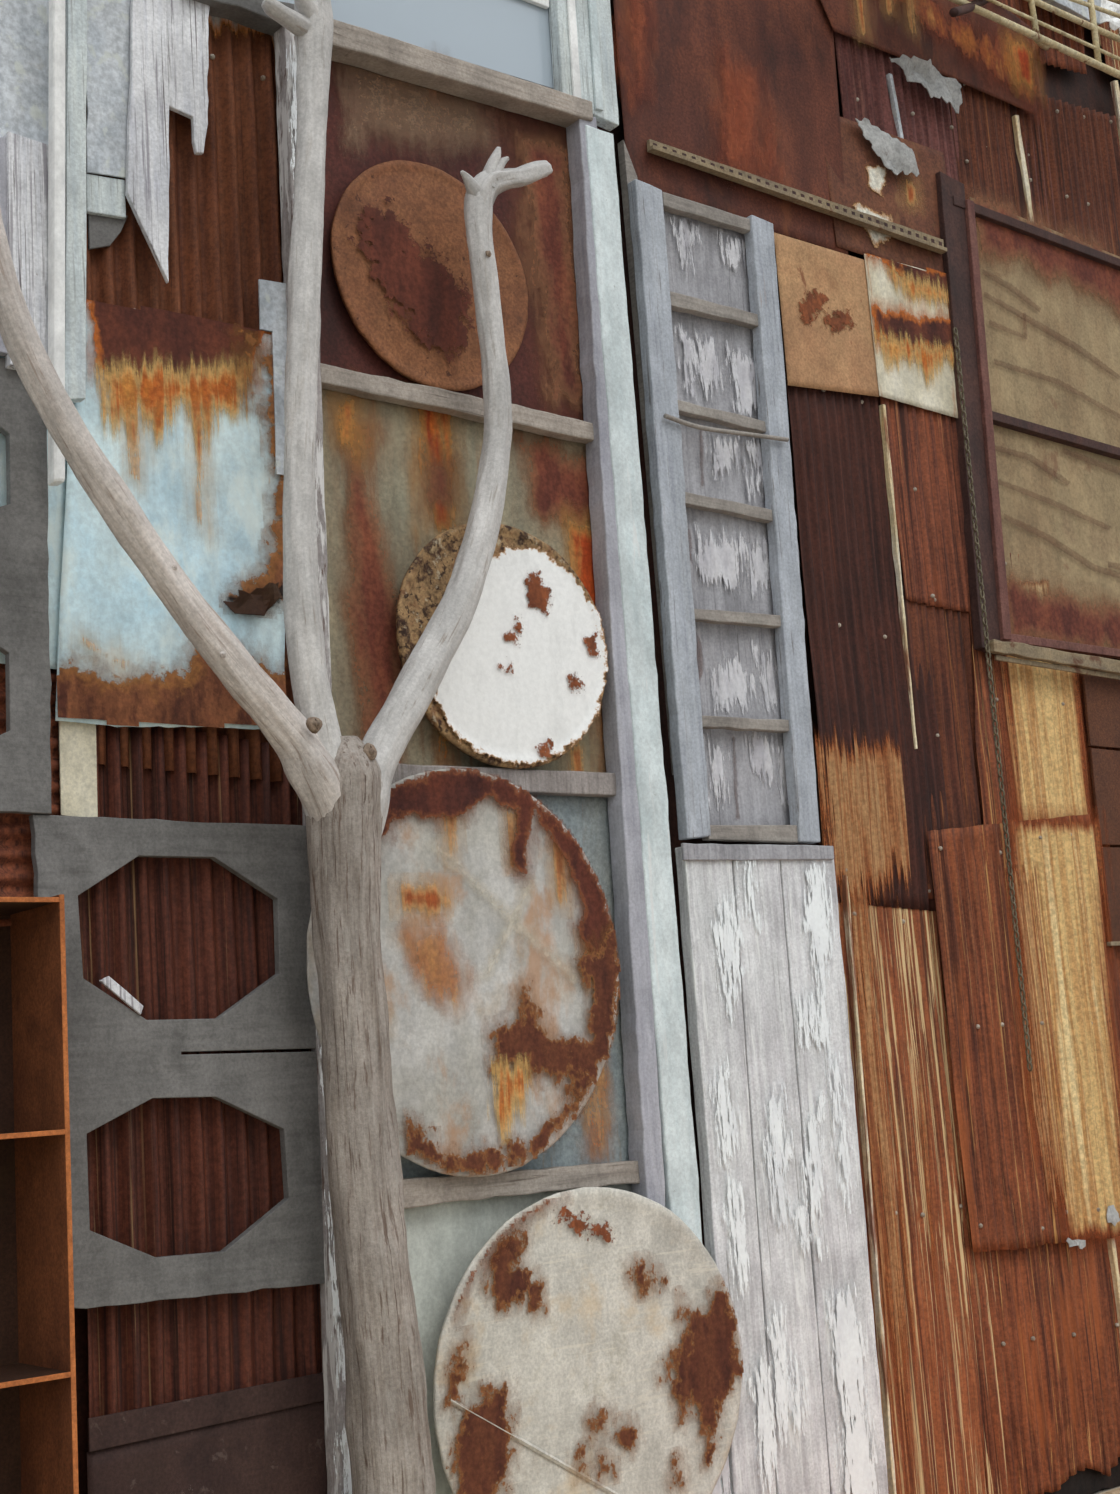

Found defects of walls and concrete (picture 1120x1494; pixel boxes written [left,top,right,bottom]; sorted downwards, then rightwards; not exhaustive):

rust [884,0,1041,124]
rust [796,253,954,384]
rust [86,299,284,608]
rust [514,429,596,606]
rust [498,570,553,674]
rust [583,632,601,658]
rust [1007,573,1120,657]
rust [381,734,621,1175]
rust [455,1198,615,1319]
rust [444,1341,521,1494]
rust [574,1406,638,1482]
rust [627,1258,744,1467]